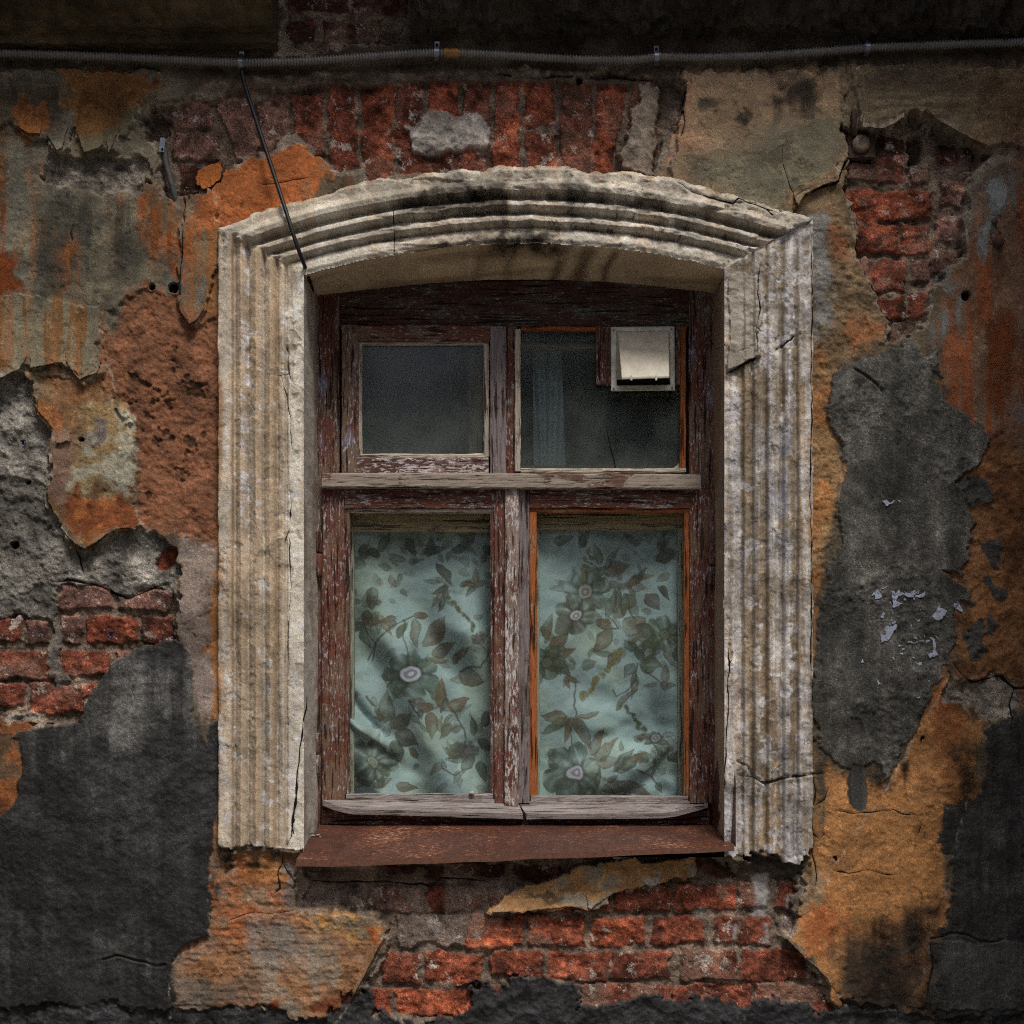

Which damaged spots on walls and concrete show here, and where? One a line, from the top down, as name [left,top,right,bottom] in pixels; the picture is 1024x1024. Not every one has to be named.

spalling [0,63,1024,345]
water stain [491,202,559,253]
crack [678,149,848,215]
spalling [0,293,183,729]
crack [728,232,813,710]
spalling [171,671,1020,1024]
crack [724,649,922,886]